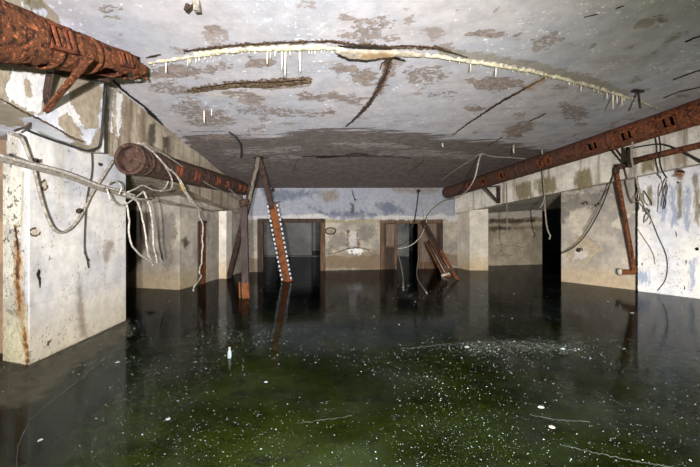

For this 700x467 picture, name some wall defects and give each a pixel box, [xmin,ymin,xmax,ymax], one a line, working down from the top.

peeling [0,64,46,114]
peeling [52,81,104,137]
crack [146,38,700,136]
efflorescence [440,50,629,96]
leakage [182,126,552,188]
rust [14,226,22,311]